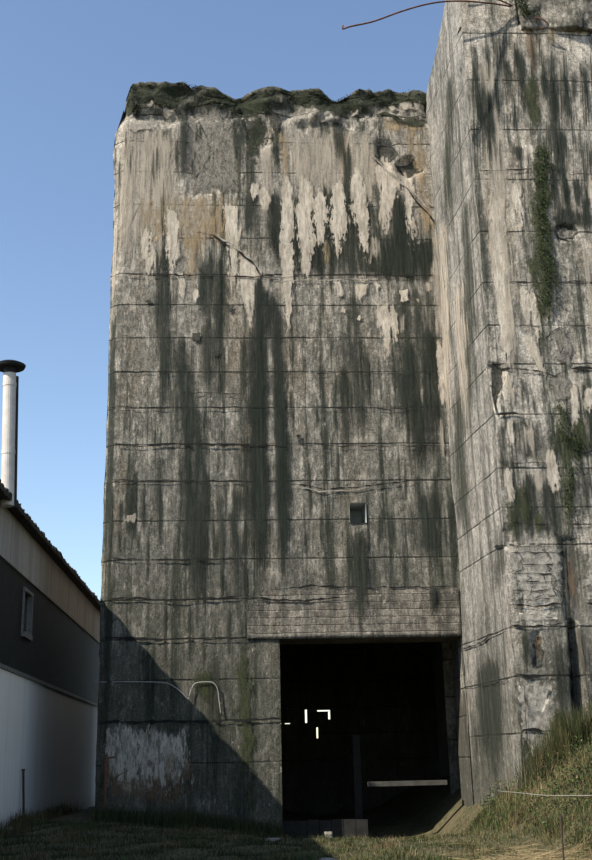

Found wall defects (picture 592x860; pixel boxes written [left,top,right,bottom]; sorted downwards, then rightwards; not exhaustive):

spalling [128,120,151,132]
spalling [162,88,427,197]
water stain [470,25,592,583]
water stain [105,80,478,812]
peeling [582,548,592,602]
peeling [102,722,194,795]
water stain [464,656,508,782]
crack [462,522,592,772]
water stain [550,642,570,735]